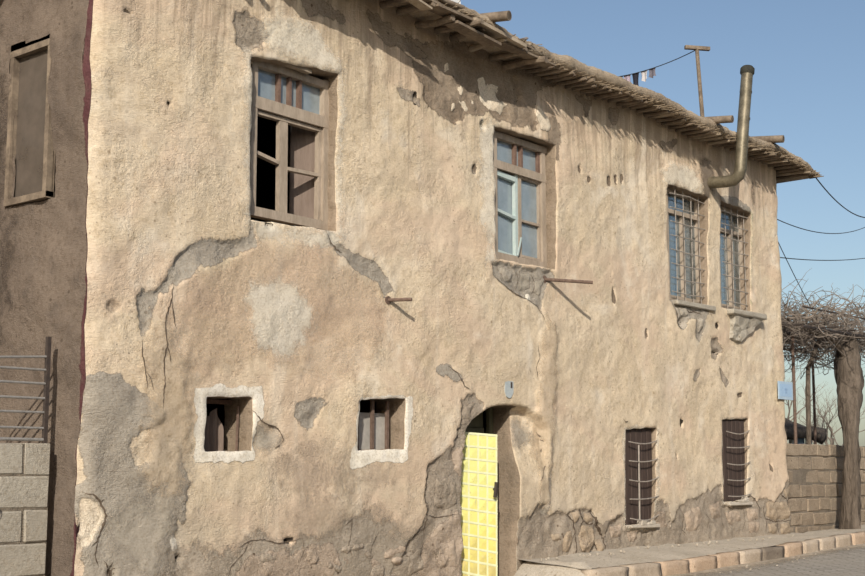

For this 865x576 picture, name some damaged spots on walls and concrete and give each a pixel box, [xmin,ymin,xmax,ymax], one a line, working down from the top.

spalling [366,10,557,131]
crack [142,284,176,411]
spalling [492,261,554,312]
spalling [670,300,729,387]
spalling [78,498,104,547]
spalling [390,393,484,576]
spalling [516,440,791,571]